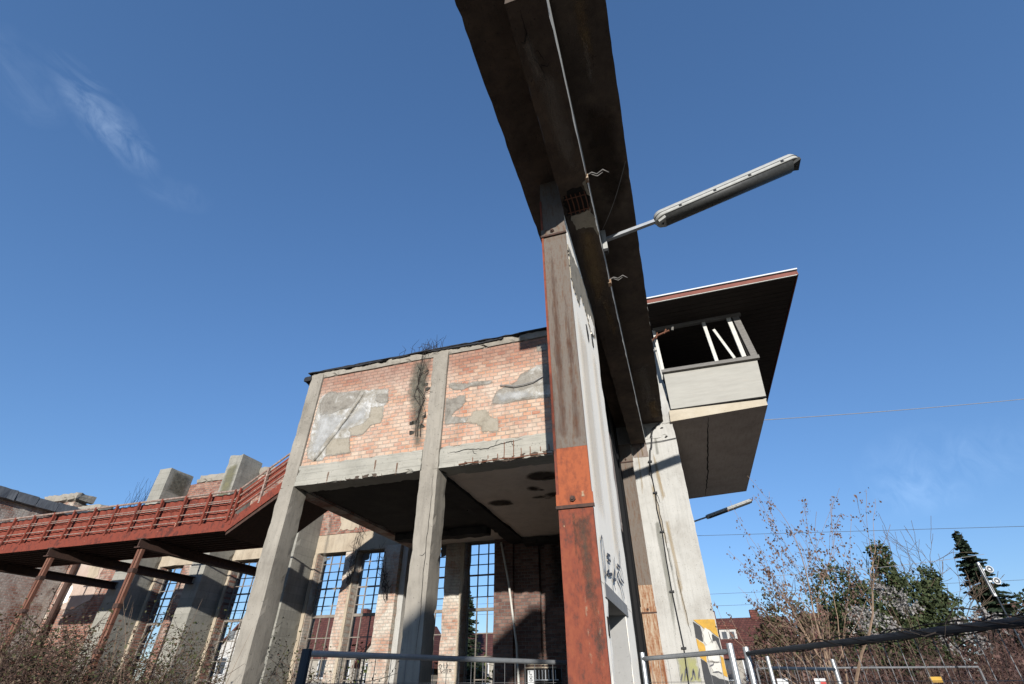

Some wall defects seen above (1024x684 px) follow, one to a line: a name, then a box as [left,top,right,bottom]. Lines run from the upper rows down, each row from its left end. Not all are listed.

flaking render [307,389,389,461]
leakage [409,362,427,444]
flaking render [444,364,551,432]
spalling [459,440,554,466]
leakage [527,472,556,498]